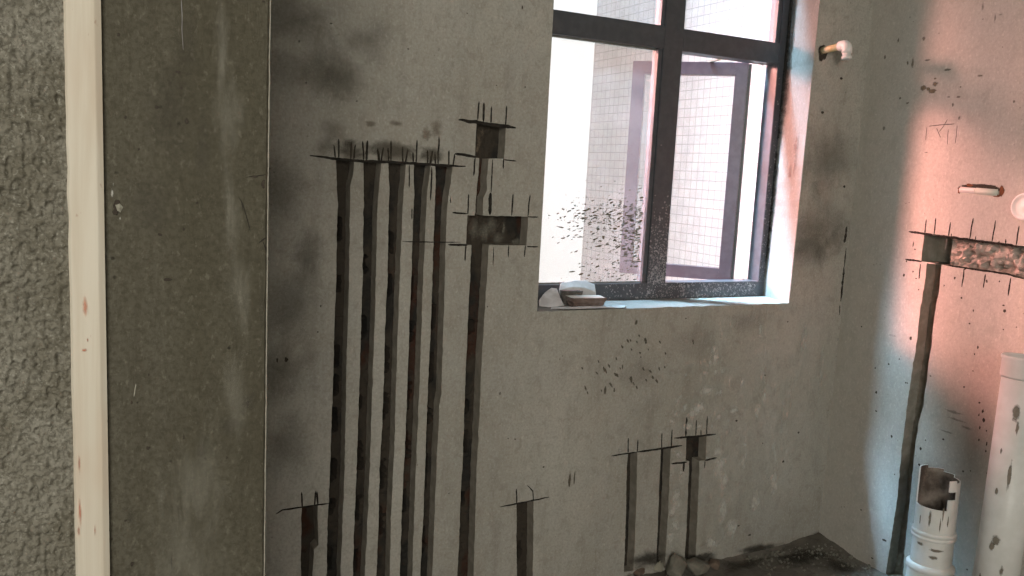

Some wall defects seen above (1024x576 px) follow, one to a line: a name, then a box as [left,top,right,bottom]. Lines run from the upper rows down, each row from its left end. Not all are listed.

crack [839,227,847,315]